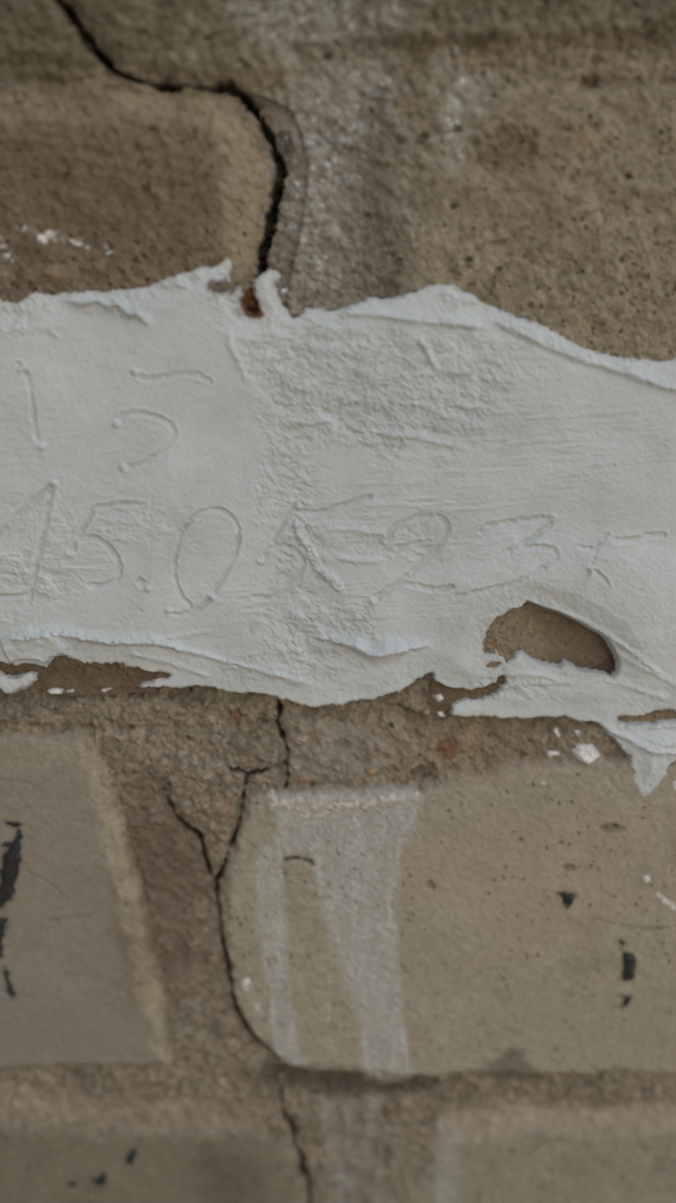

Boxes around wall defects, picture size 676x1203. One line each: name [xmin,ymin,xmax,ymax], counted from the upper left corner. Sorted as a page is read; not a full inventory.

crack [50,0,290,300]
spalling [0,632,169,695]
spalling [427,601,615,718]
crack [161,697,314,1203]